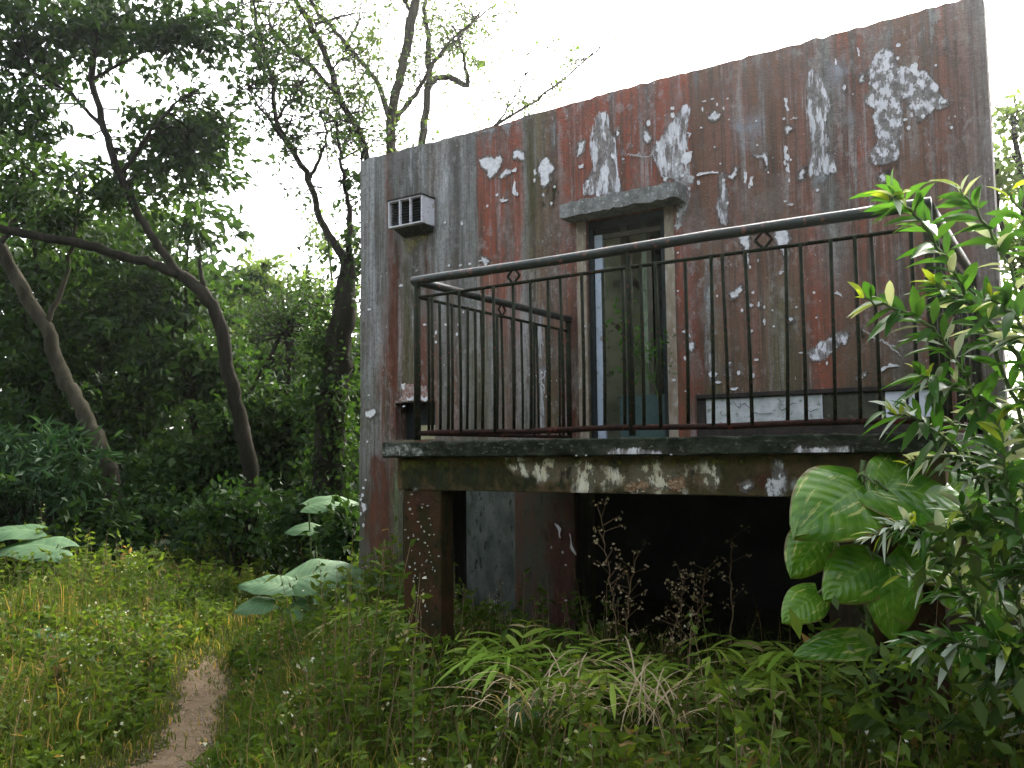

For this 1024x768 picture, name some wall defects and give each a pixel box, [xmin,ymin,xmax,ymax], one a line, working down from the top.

peeling [642,120,652,145]
peeling [479,148,526,207]
peeling [533,155,556,206]
rust [389,242,399,434]
peeling [799,331,849,365]
spalling [624,475,686,493]
rust [365,456,391,569]